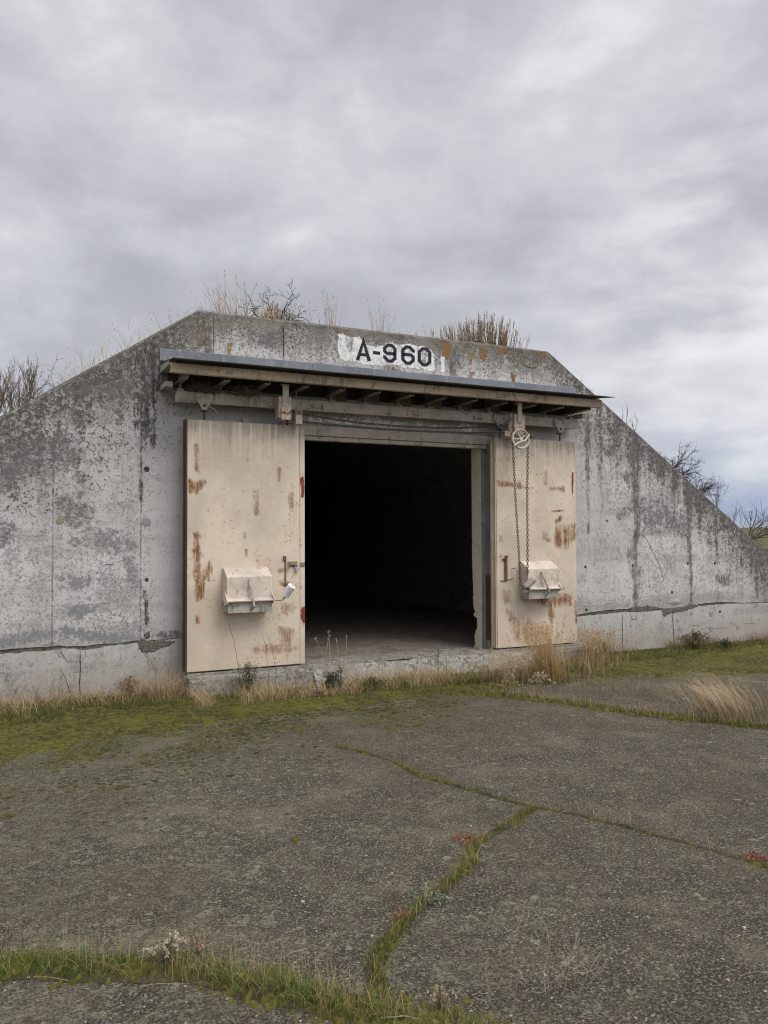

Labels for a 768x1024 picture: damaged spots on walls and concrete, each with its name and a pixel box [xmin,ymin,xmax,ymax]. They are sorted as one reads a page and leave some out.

rust [189,445,206,493]
rust [546,510,576,548]
water stain [583,412,718,605]
rust [193,532,212,599]
crack [577,602,768,647]
crack [0,638,179,689]